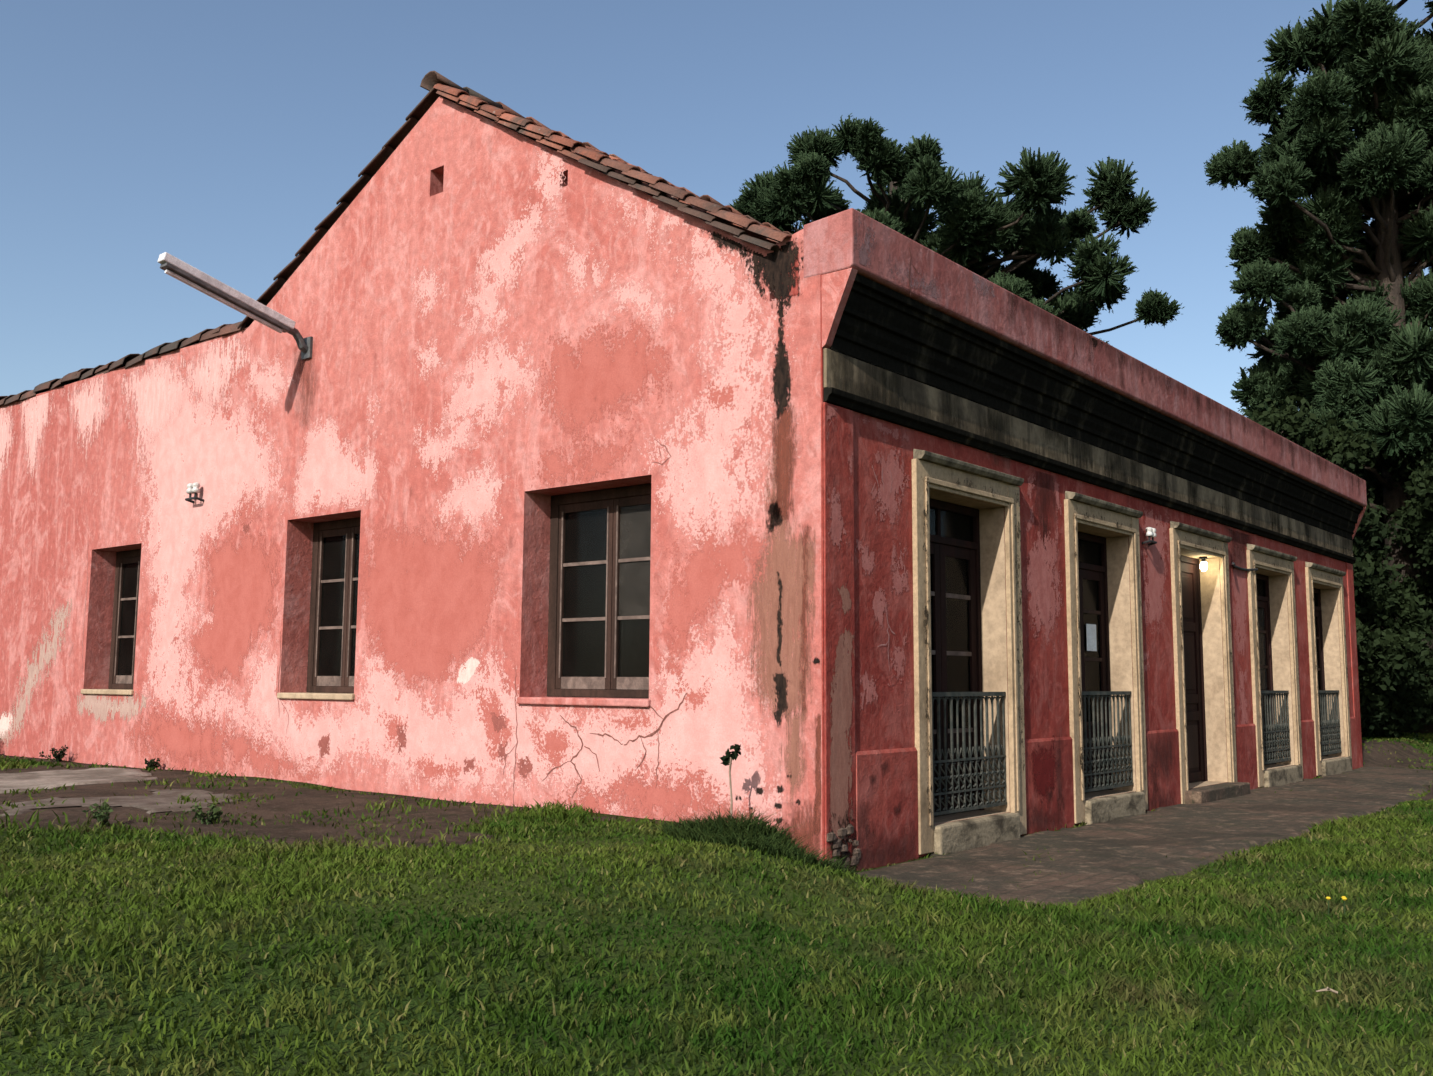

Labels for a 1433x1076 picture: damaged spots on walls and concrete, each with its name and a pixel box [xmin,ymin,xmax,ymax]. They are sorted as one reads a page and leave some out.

peeling [403,149,807,560]
damp [701,230,803,314]
spalling [0,598,72,747]
peeling [74,348,907,871]
crack [503,666,687,804]
peeling [827,418,932,815]